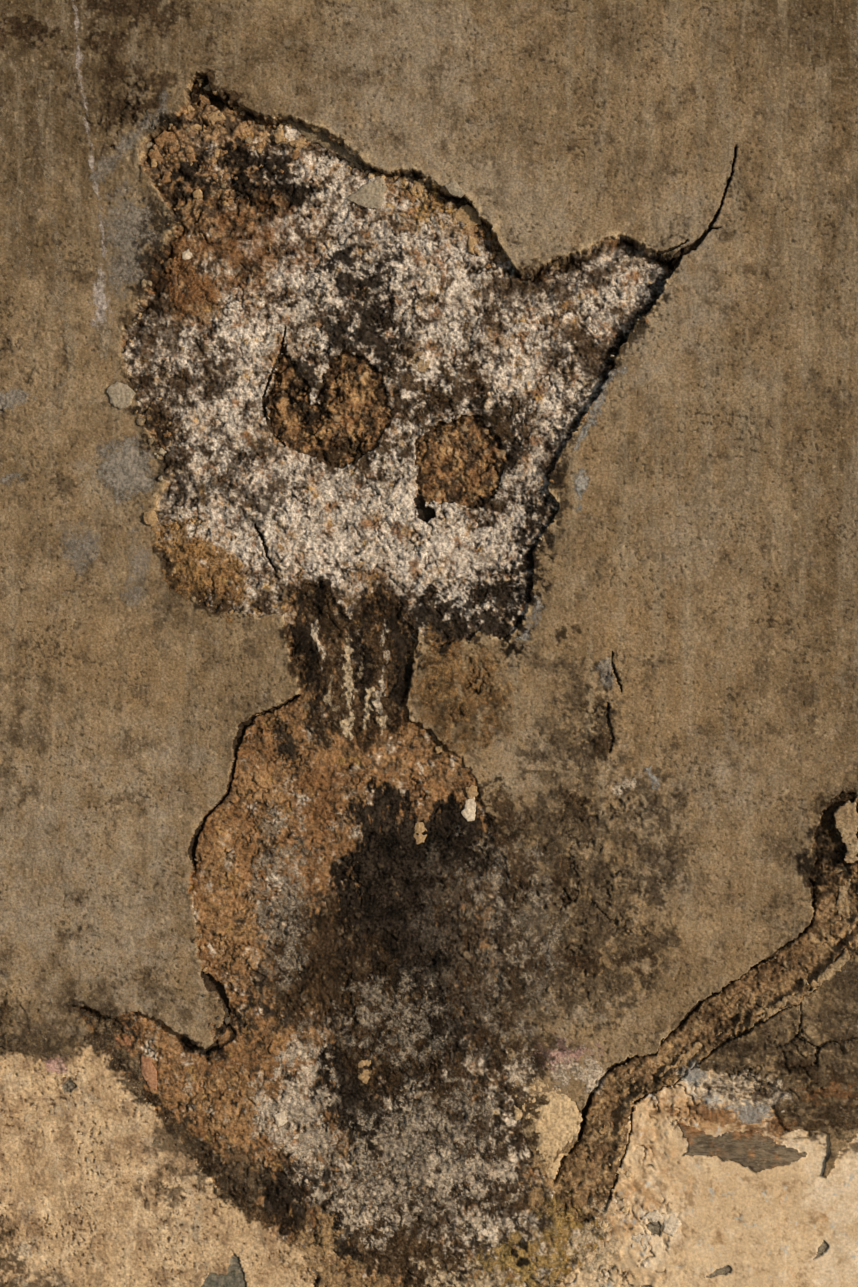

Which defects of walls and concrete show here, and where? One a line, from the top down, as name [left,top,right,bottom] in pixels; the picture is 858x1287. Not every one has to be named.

spalling [107,72,675,711]
crack [656,147,737,270]
crack [200,971,237,1051]
crack [188,694,301,868]
leakage [0,625,691,1287]
spalling [0,661,858,1287]